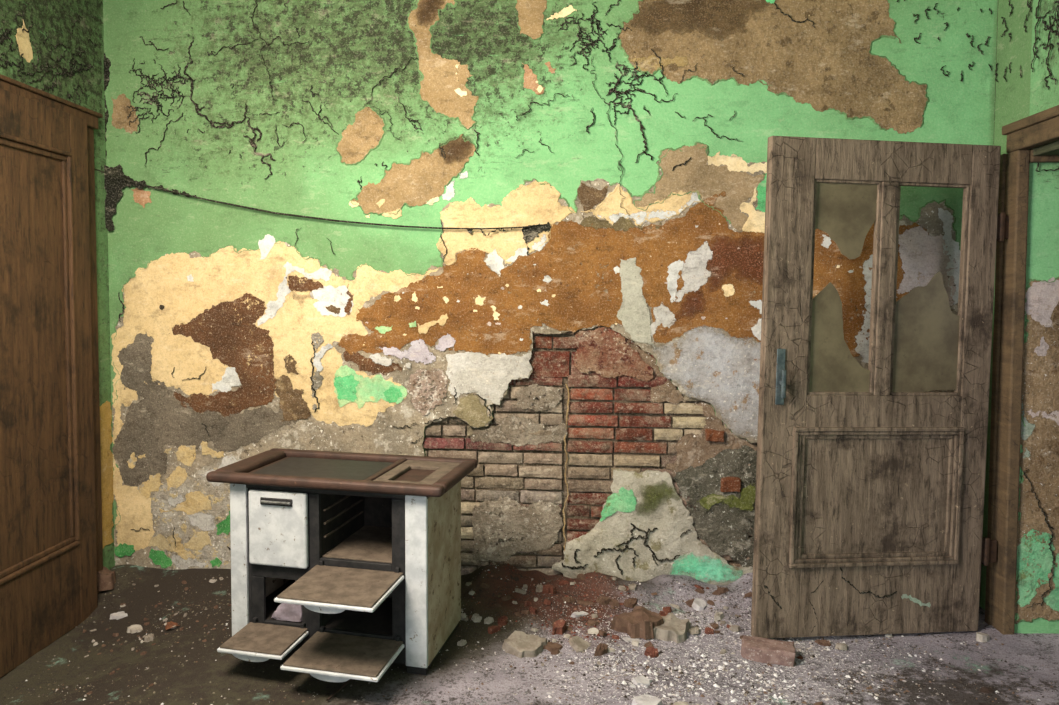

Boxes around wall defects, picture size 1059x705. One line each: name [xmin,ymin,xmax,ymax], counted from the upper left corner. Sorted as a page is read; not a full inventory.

leakage [127,58,195,134]
crack [140,0,339,179]
crack [516,49,738,216]
flaking render [616,0,930,134]
crack [1031,0,1059,85]
peeling [100,0,767,575]
peeling [899,199,957,247]
flaking render [1015,276,1059,624]
crack [1024,469,1055,608]